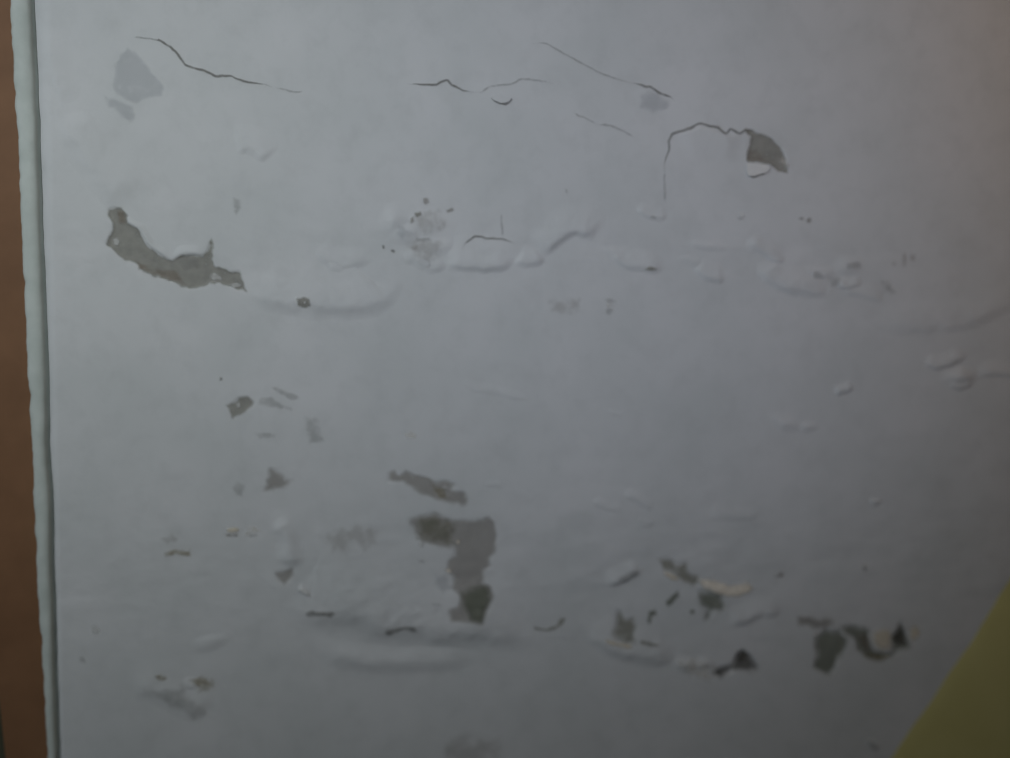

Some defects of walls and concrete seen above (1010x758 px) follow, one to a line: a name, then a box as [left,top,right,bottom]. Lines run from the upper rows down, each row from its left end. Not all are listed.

crack [158,39,253,83]
spalling [746,130,787,178]
spalling [107,208,246,291]
peeling [229,398,252,416]
peeling [465,587,489,621]
spalling [663,561,752,609]
spalling [716,652,755,676]
spalling [816,627,919,672]